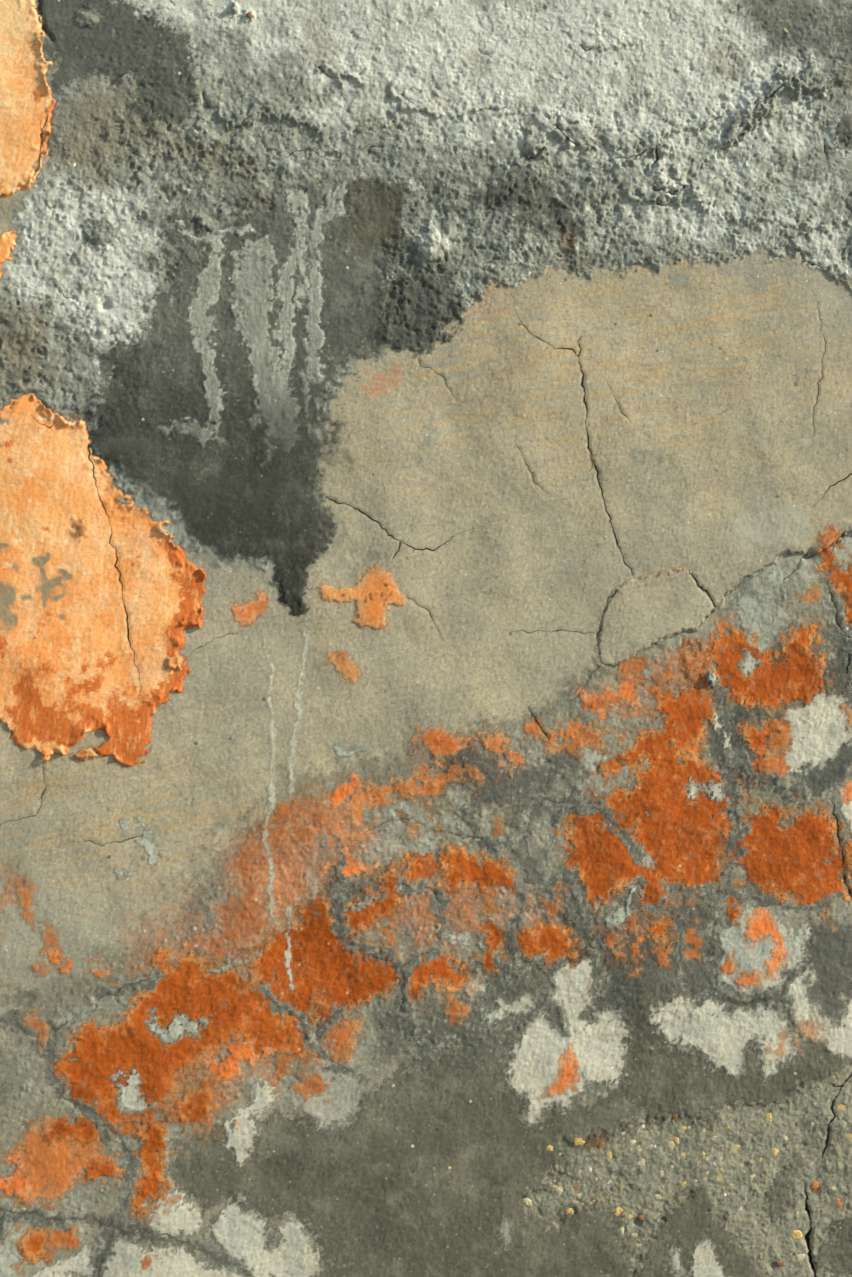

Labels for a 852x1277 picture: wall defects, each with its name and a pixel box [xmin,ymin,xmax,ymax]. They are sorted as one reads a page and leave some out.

crack [88,444,141,706]
water stain [71,173,464,990]
crack [325,496,470,559]
flaking render [0,0,852,767]
crack [418,358,461,402]
crack [500,289,852,703]
spalling [0,524,852,1277]
water stain [168,879,842,1277]
water stain [802,914,852,1022]
crack [804,1074,852,1277]
water stain [815,1216,852,1277]